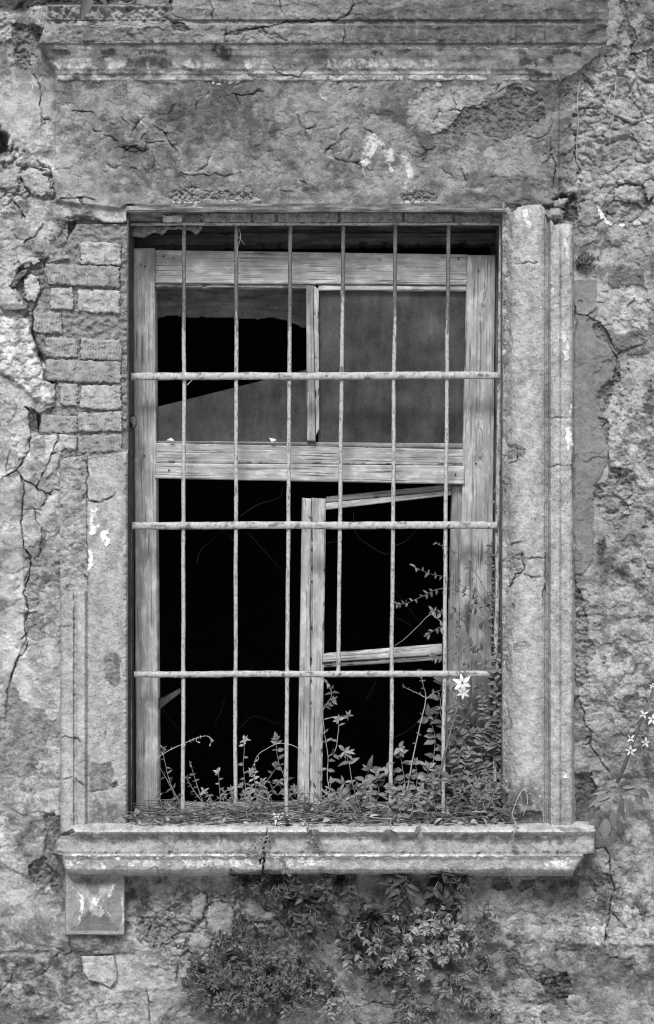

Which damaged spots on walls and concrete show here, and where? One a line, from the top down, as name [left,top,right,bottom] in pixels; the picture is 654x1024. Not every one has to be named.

flaking render [297,44,604,144]
flaking render [0,215,127,607]
flaking render [597,363,619,443]
flaking render [593,468,637,529]
crack [6,438,58,696]
flaking render [29,810,380,925]
crack [594,848,622,959]